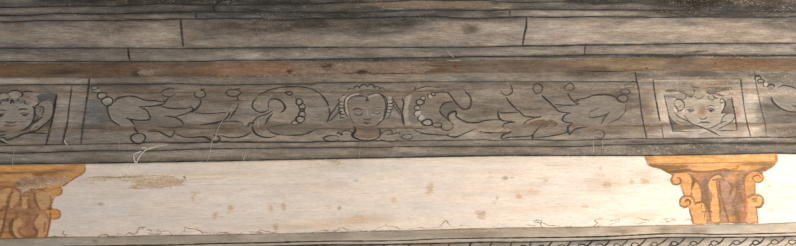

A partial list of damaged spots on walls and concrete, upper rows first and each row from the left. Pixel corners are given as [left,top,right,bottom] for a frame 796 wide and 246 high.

peeling [86,174,186,189]